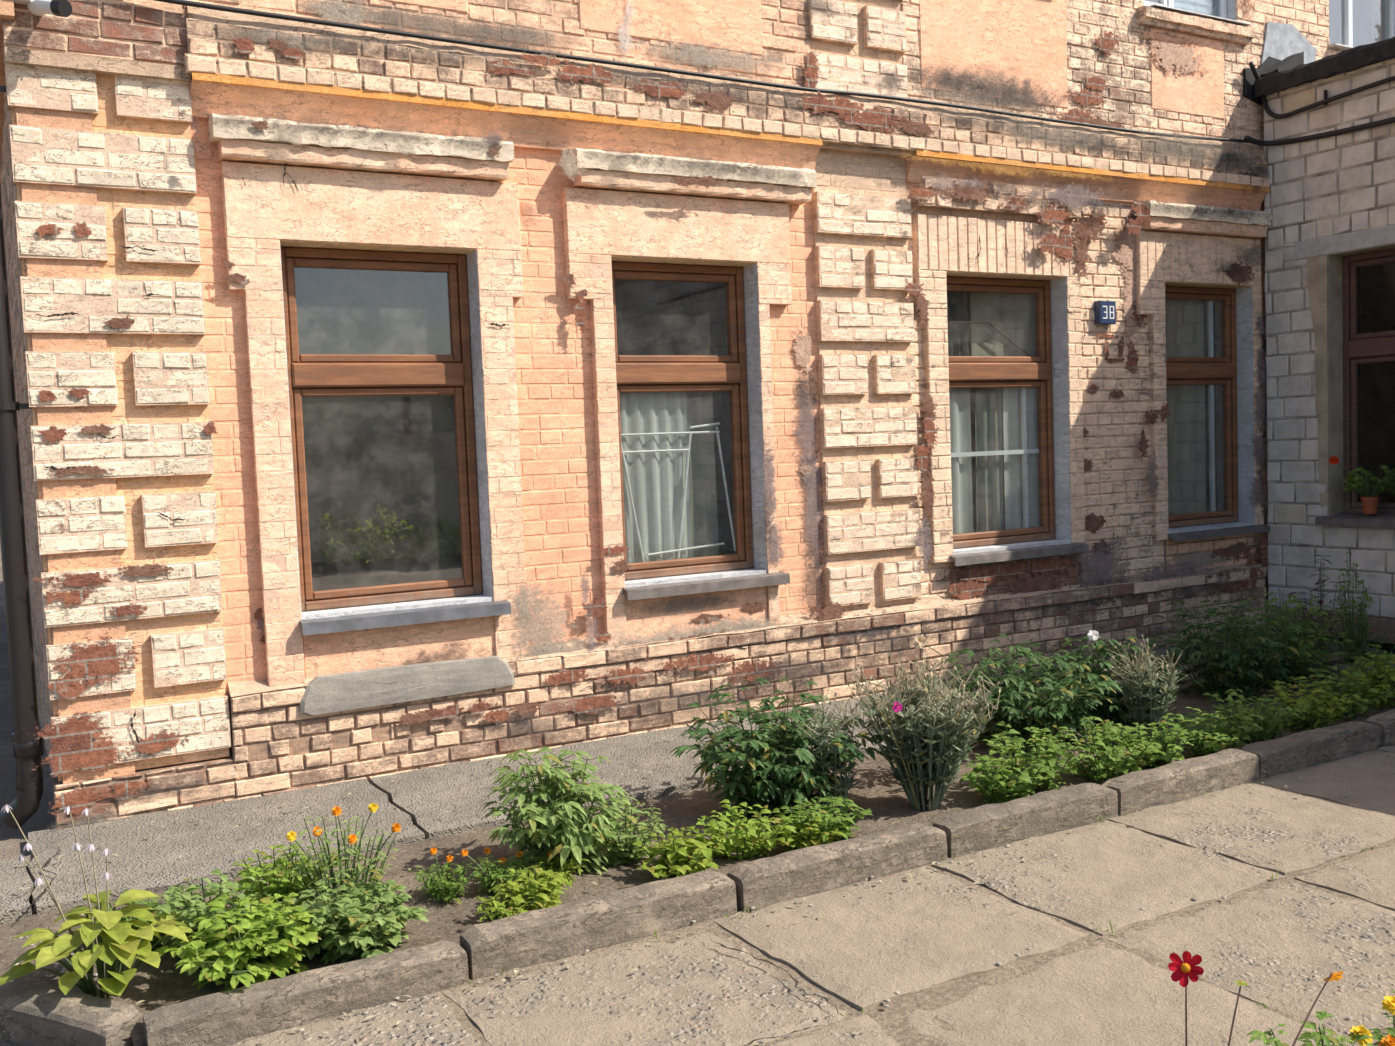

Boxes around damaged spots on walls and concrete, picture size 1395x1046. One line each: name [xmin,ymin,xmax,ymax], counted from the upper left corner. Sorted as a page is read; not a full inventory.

damp [309,0,556,45]
damp [924,68,1042,109]
damp [1028,185,1113,212]
peeling [27,221,92,238]
peeling [904,183,1165,400]
peeling [34,423,115,443]
peeling [49,465,129,478]
damp [792,377,824,580]
damp [761,441,784,566]
peeling [31,562,185,618]
damp [807,599,927,644]
peeling [33,633,194,825]